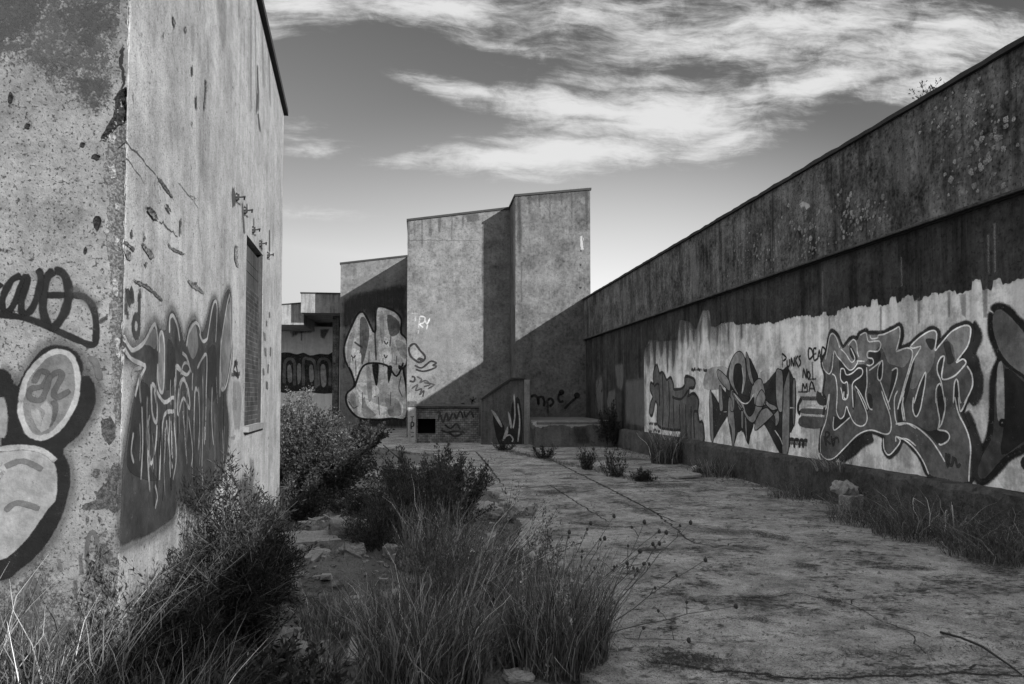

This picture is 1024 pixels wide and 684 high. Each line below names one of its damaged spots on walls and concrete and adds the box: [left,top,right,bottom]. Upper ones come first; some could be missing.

water stain [0,0,130,113]
crack [123,136,203,250]
spalling [146,200,182,234]
spalling [80,87,154,524]
crack [649,593,1024,680]